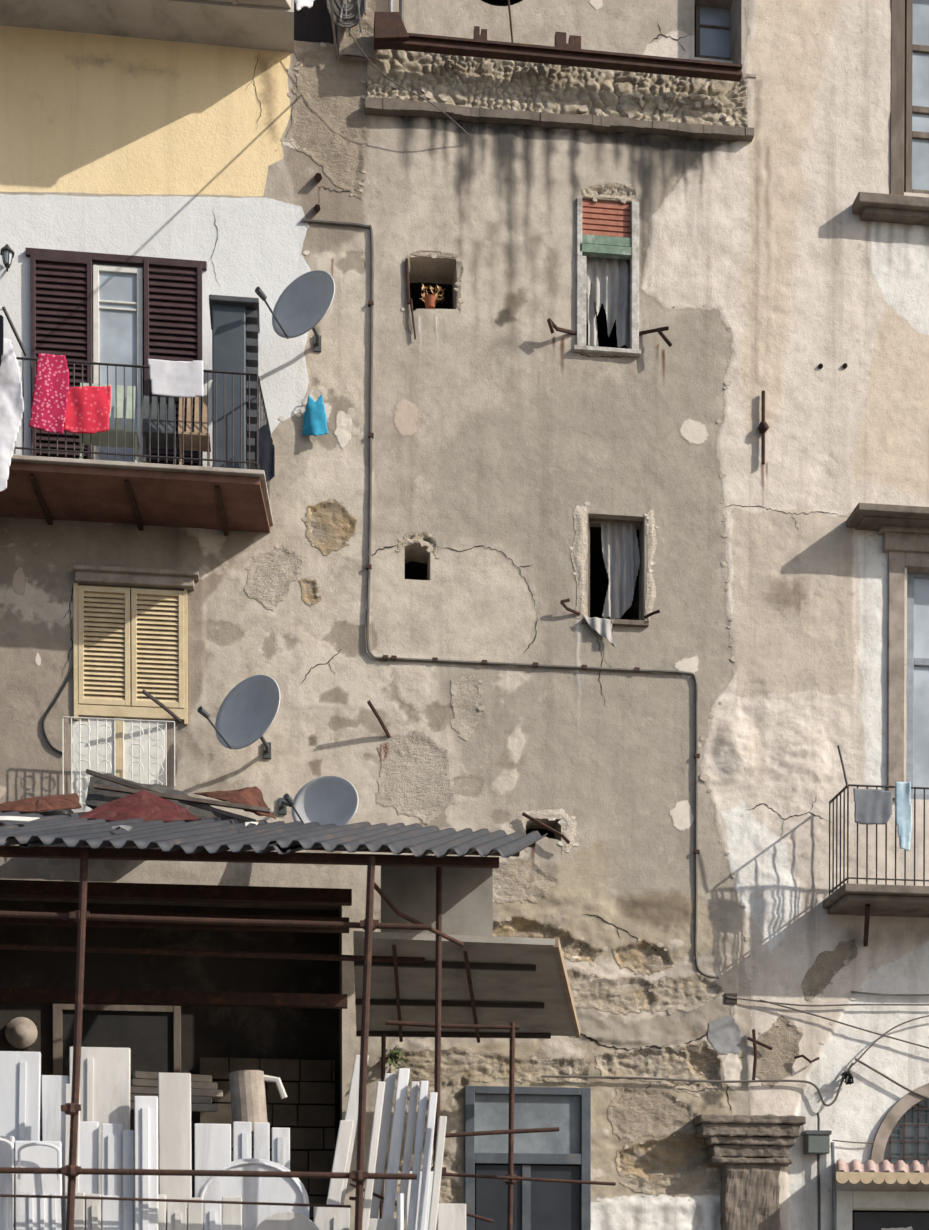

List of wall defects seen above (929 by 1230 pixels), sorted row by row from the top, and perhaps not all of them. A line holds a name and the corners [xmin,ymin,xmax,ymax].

crack [650,22,691,50]
damp [400,116,415,143]
damp [430,118,553,191]
spalling [275,42,748,199]
damp [570,129,579,190]
damp [595,132,716,219]
spalling [244,498,357,611]
crack [440,545,538,654]
spalling [509,808,579,854]
crack [748,796,827,836]
spalling [493,857,752,1015]
spalling [385,1040,723,1230]